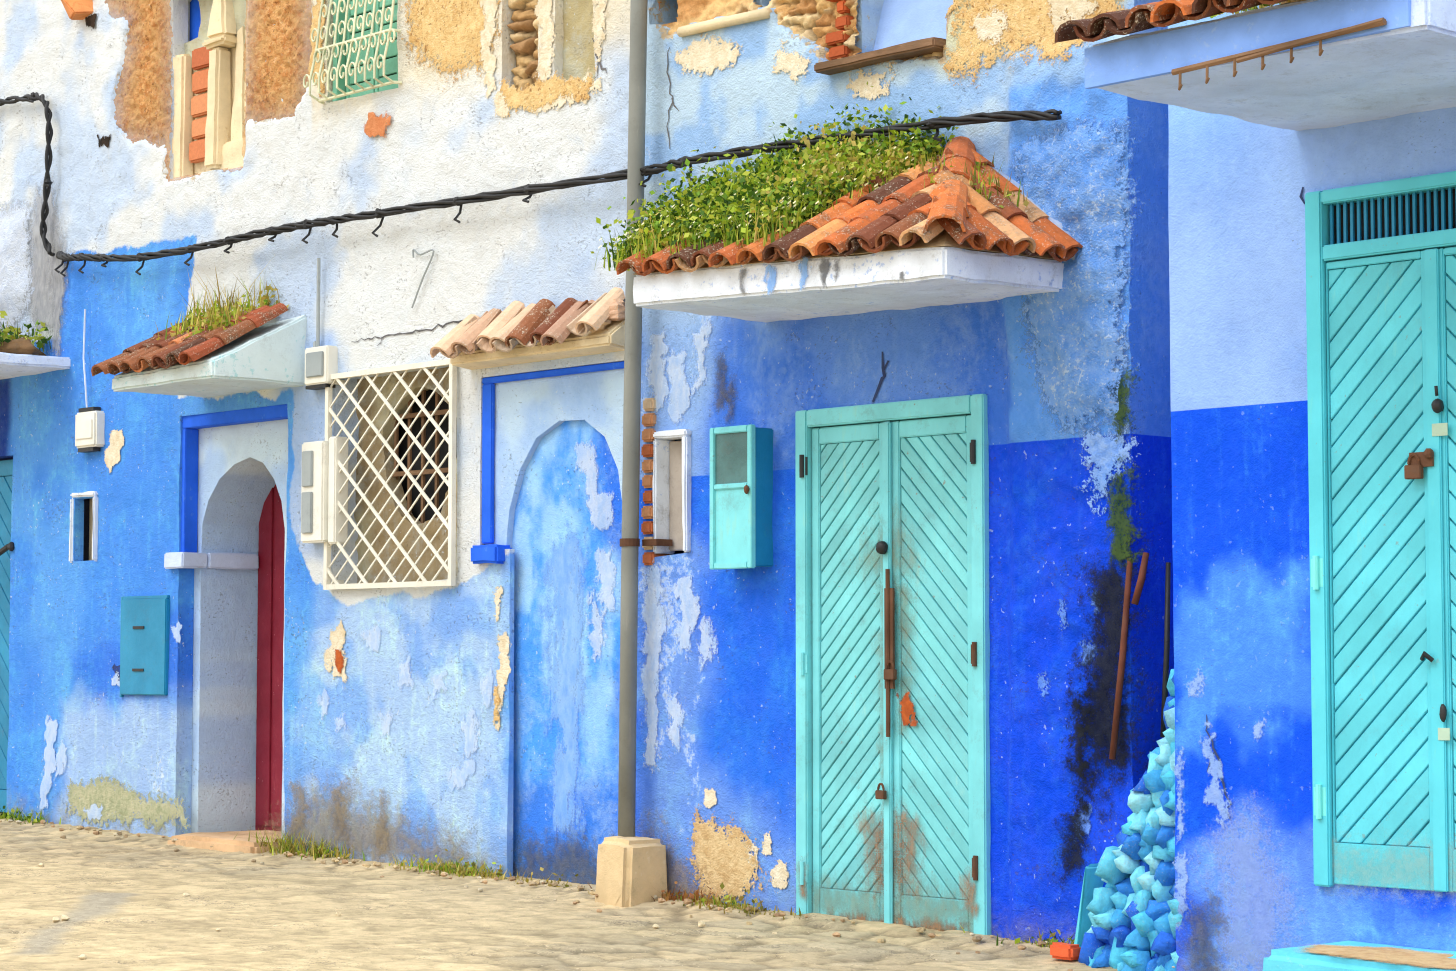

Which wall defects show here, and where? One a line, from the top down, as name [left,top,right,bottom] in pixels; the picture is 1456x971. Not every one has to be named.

spalling [61,0,201,181]
spalling [223,0,326,172]
peeling [655,0,1125,103]
peeling [316,620,381,732]
peeling [397,656,447,700]
peeling [445,585,512,792]
peeling [641,561,719,773]
rust [896,692,918,726]
damp [1053,532,1159,889]
damp [278,782,469,867]
peeling [686,788,789,903]
rust [860,811,918,888]